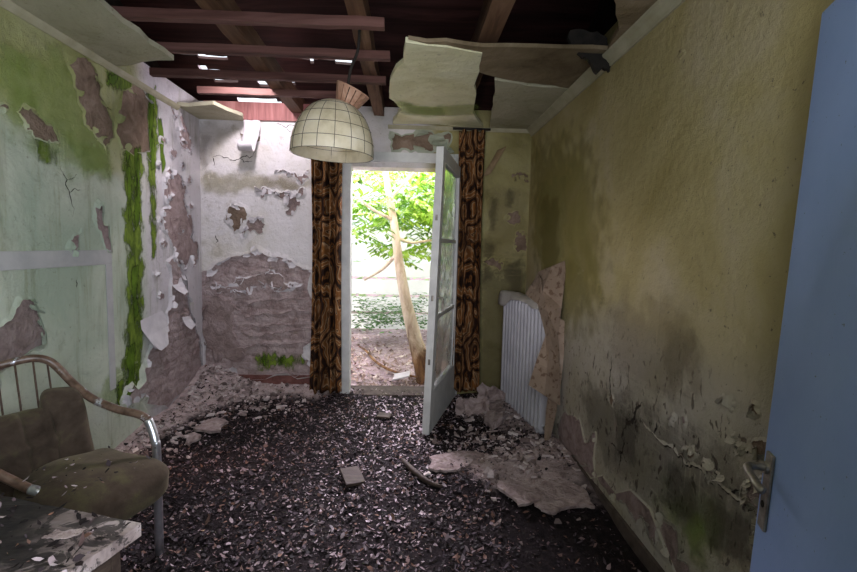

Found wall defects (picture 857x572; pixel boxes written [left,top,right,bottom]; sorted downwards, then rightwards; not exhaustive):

flaking render [65,55,312,411]
peeling [0,295,47,396]
crack [611,417,757,515]
peeling [681,444,725,485]
peeling [750,436,767,461]